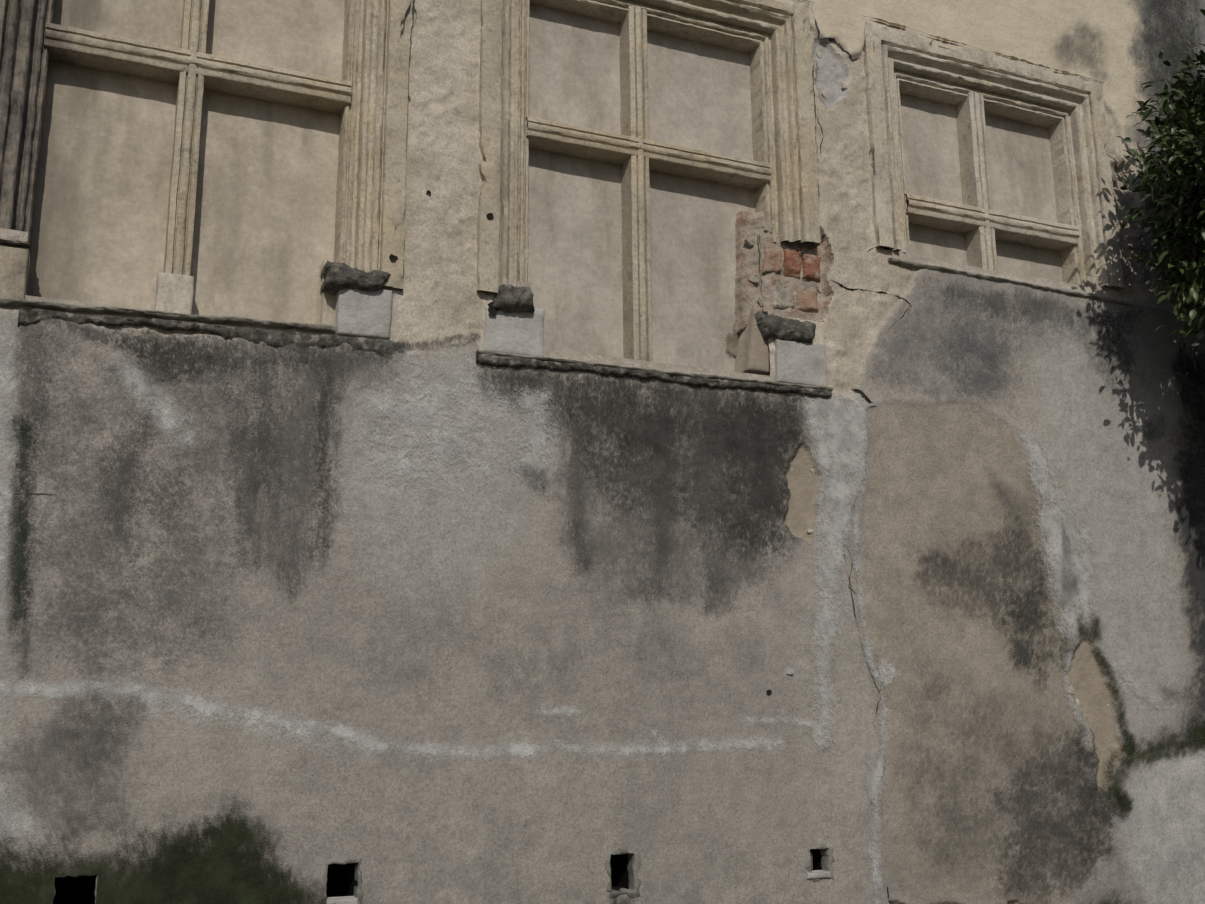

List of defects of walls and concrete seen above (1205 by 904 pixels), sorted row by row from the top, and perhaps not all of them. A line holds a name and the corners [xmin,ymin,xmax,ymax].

crack [409,0,417,64]
crack [803,0,1104,195]
spalling [744,223,834,322]
leakage [0,322,806,663]
flaking render [784,441,823,544]
crack [842,389,885,806]
leakage [1018,427,1099,639]
leakage [0,652,782,837]
leakage [852,518,888,904]
flaking render [1066,638,1127,794]